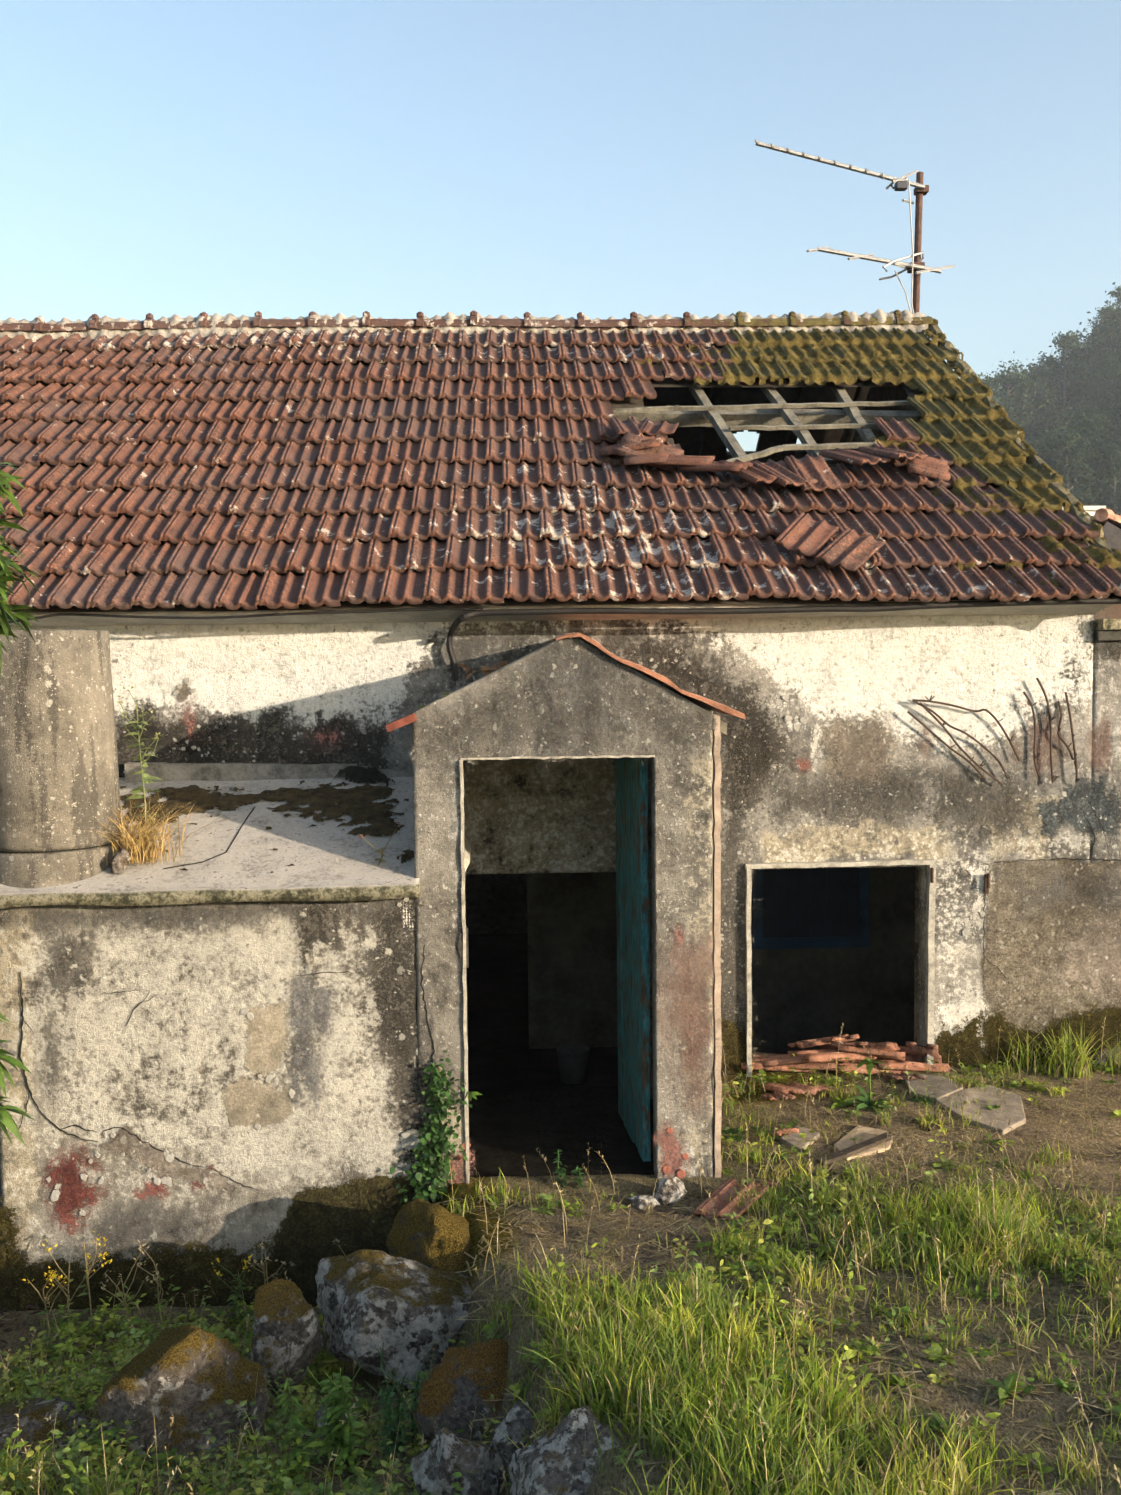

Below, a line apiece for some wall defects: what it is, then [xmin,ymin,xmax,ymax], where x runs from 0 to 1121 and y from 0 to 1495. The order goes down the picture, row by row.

damp [116,699,395,778]
damp [410,621,1121,1036]
damp [1075,609,1121,669]
crack [18,972,259,1191]
damp [4,898,436,1174]